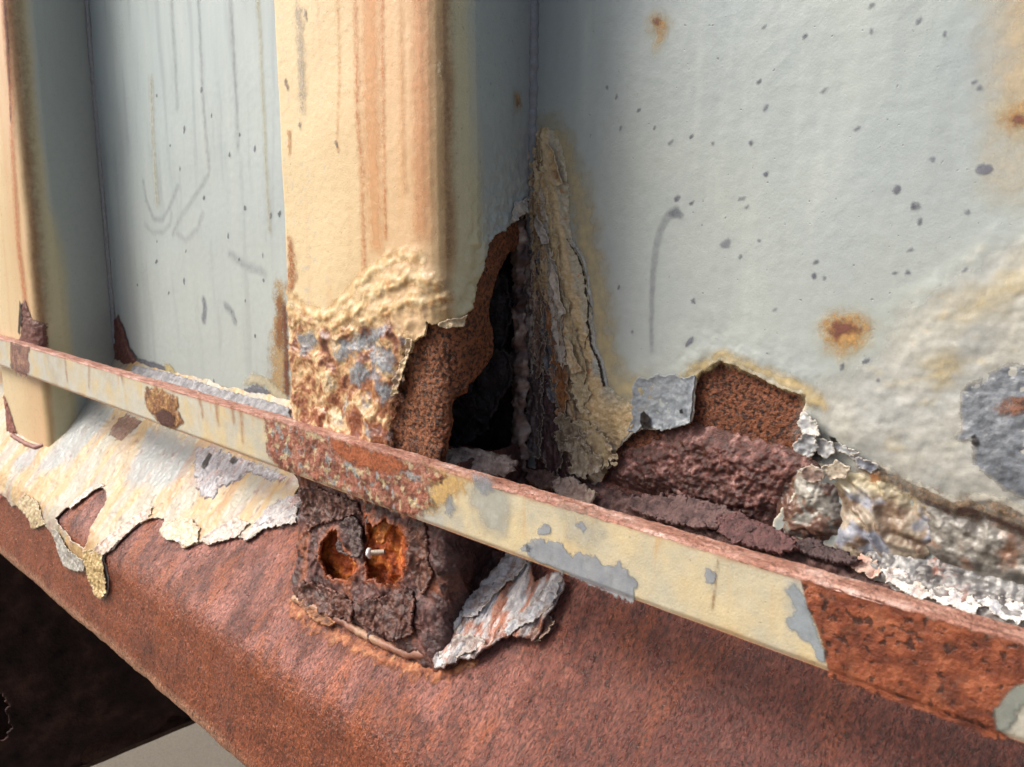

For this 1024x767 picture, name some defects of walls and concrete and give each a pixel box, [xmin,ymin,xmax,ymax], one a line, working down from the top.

rust [3,0,48,378]
rust [113,315,136,364]
crack [566,238,608,387]
peeling [387,127,1024,628]
rust [823,314,869,353]
peeling [0,359,299,599]
rust [263,417,465,518]
rust [525,468,599,504]
rust [606,422,819,556]
peeling [289,524,637,684]
rust [801,580,1024,739]